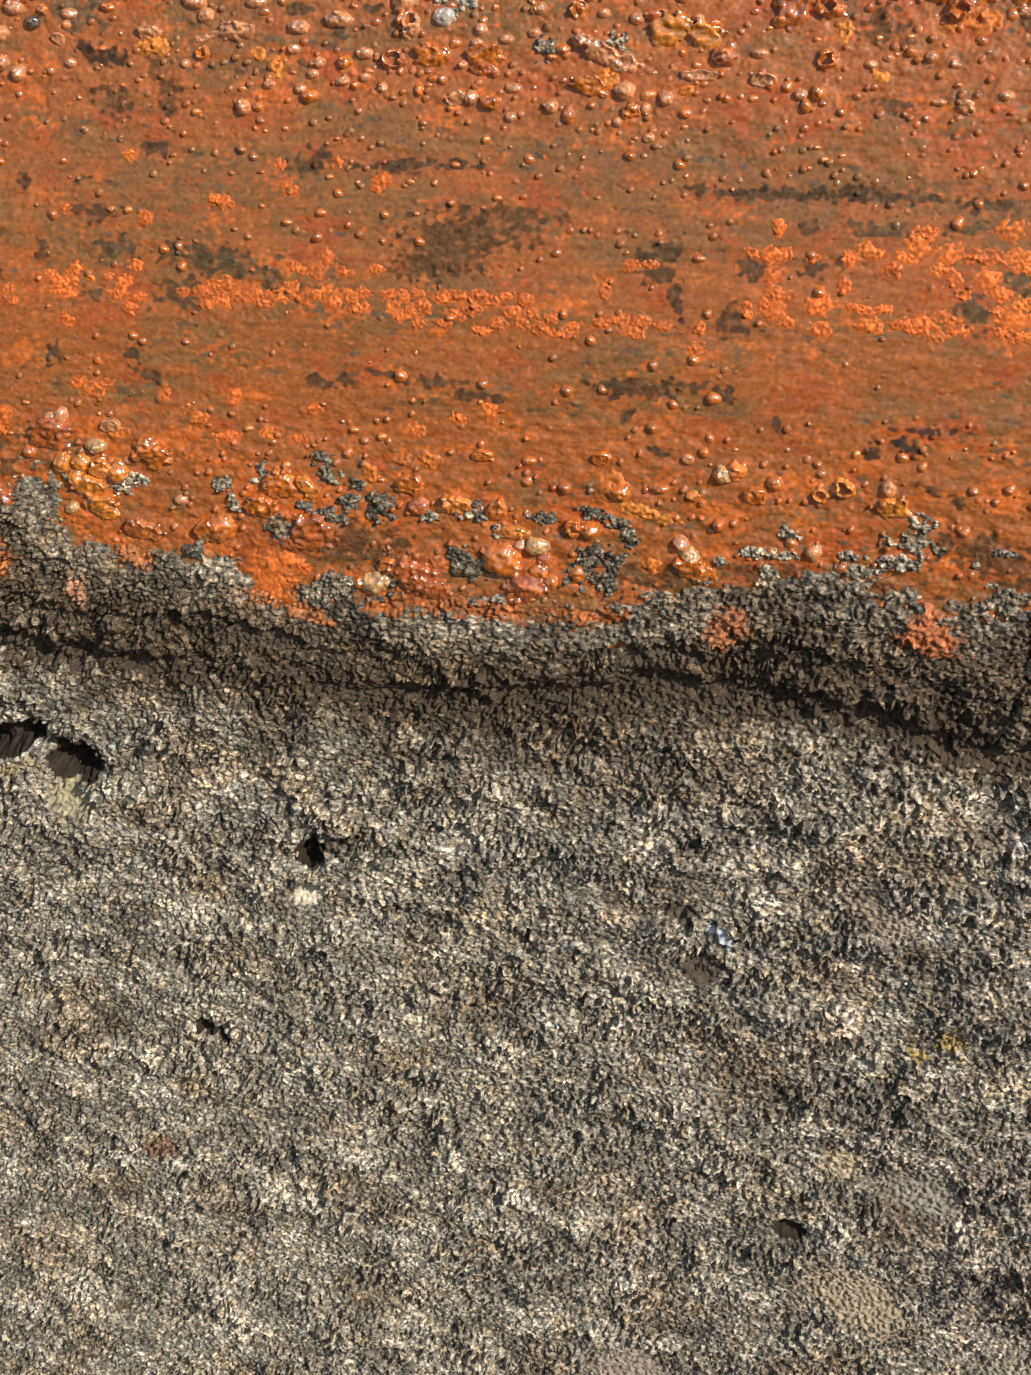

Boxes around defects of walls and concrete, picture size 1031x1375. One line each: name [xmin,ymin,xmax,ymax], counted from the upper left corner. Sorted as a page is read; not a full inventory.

corrosion [0,0,78,82]
corrosion [132,0,548,123]
corrosion [543,0,777,128]
corrosion [772,0,860,101]
corrosion [917,0,1031,37]
corrosion [175,244,674,340]
corrosion [740,213,1031,345]
corrosion [0,404,174,572]
corrosion [193,421,632,633]
corrosion [591,451,718,586]
corrosion [699,598,754,653]
corrosion [887,600,974,661]